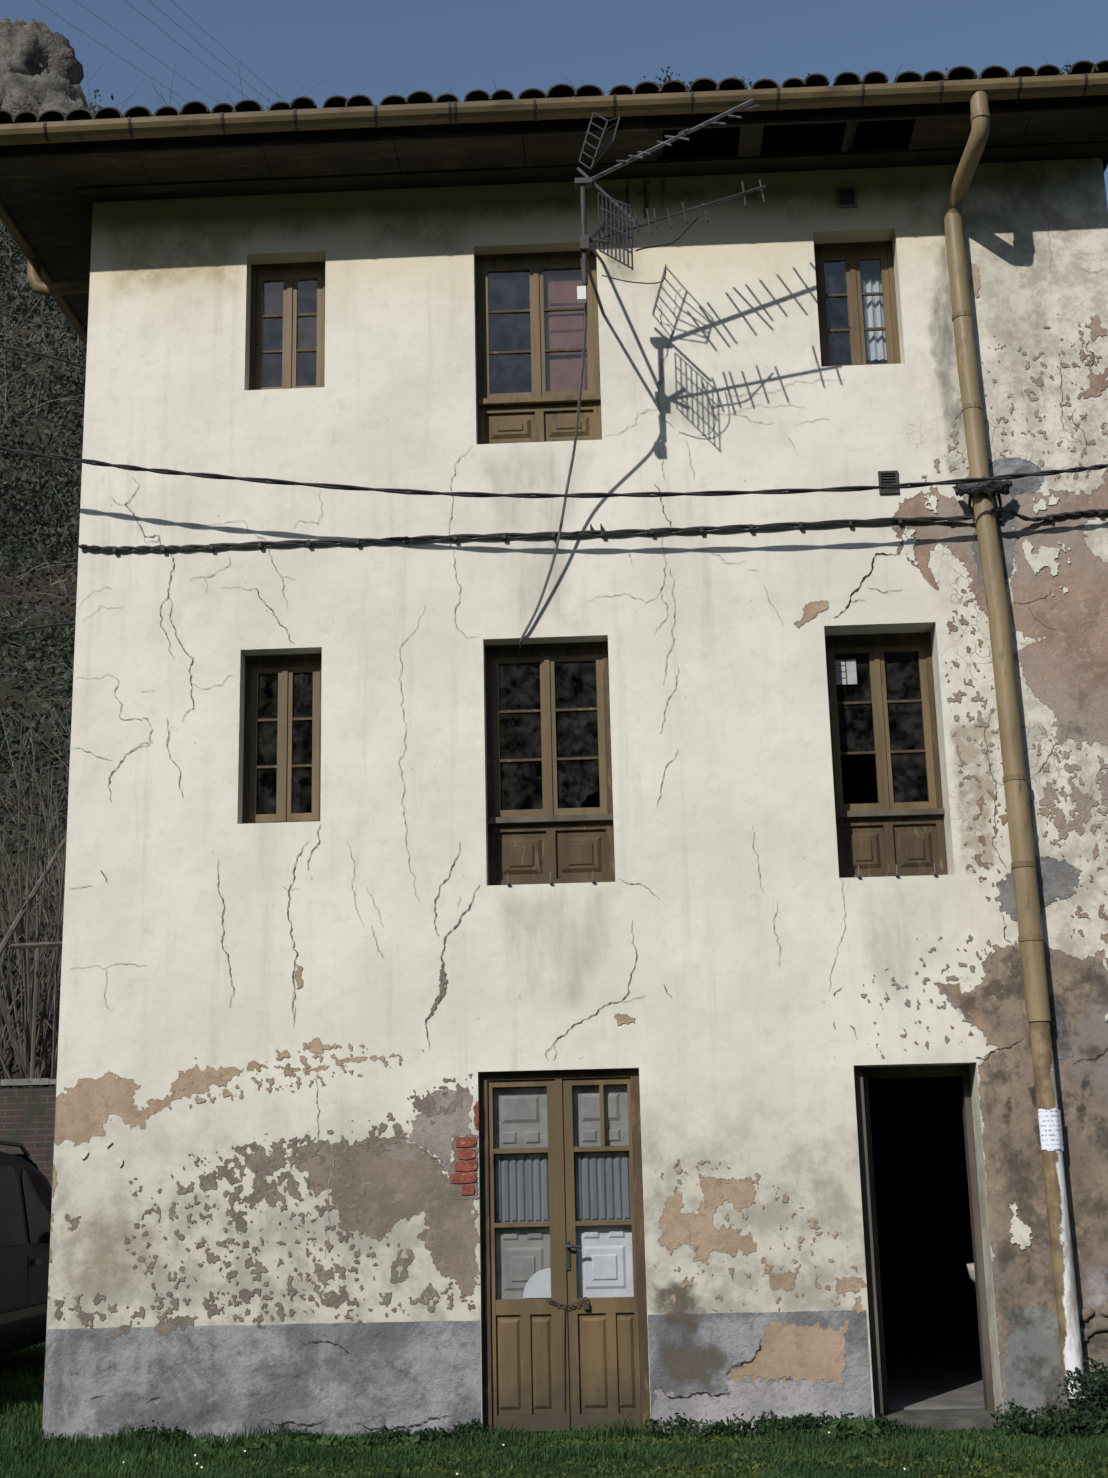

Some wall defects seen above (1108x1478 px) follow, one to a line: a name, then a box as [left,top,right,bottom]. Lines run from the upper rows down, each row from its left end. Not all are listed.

crack [72,479,323,801]
crack [217,859,234,1005]
crack [283,824,383,1024]
crack [398,445,479,1049]
crack [545,925,672,1060]
crack [593,286,843,807]
crack [833,552,902,618]
flaking render [891,399,1007,901]
flaking render [981,314,1108,1419]
flaking render [48,1037,481,1341]
flaking render [650,1156,867,1433]
flaking render [861,935,1057,1415]